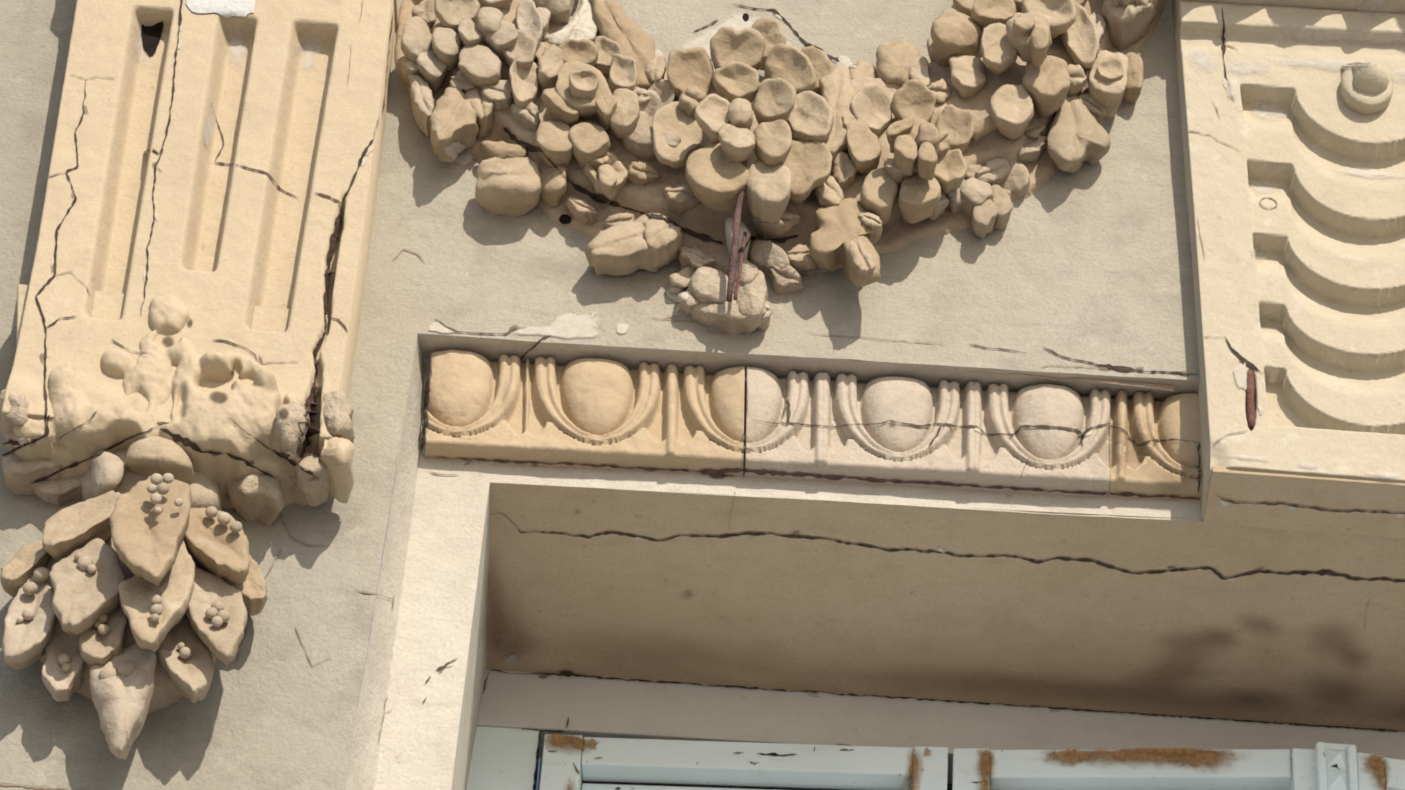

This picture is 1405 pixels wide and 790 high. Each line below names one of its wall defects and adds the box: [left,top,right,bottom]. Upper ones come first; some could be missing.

crack [693,4,858,68]
crack [503,127,836,273]
crack [2,0,394,484]
crack [435,319,551,361]
spalling [517,314,598,338]
crack [421,359,1405,628]
crack [265,514,313,578]
crack [295,626,331,667]
corrosion [981,753,993,790]
corrosion [1049,748,1222,765]
corrosion [1368,755,1387,790]